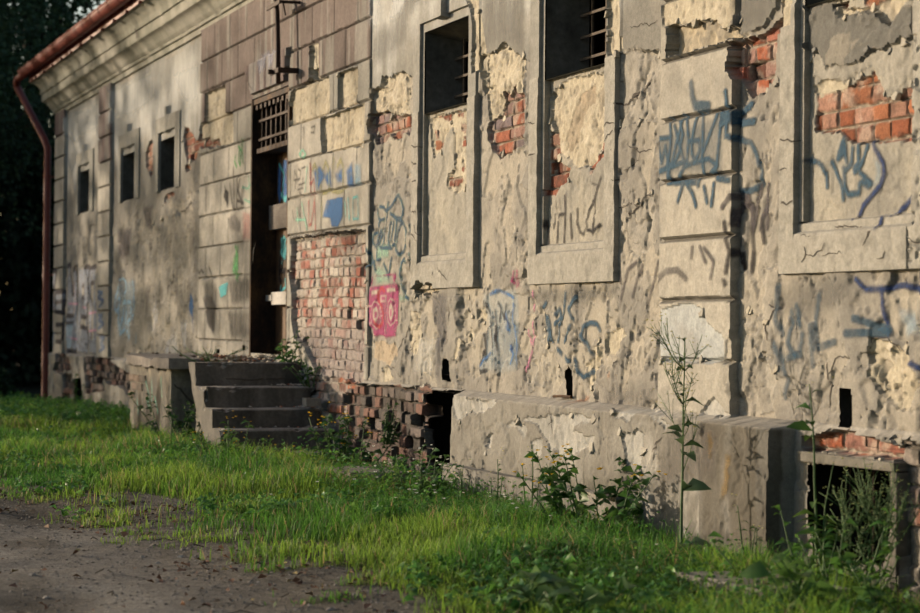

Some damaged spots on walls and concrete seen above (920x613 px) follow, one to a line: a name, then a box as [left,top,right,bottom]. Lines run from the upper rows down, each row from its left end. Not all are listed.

spalling [365,71,412,143]
spalling [470,0,527,159]
spalling [545,71,605,195]
crack [604,80,652,181]
flaking render [604,0,914,143]
crack [619,192,651,219]
crack [800,224,885,262]
flaking render [291,229,444,482]
spalling [454,393,498,425]
spalling [508,412,597,458]
spalling [659,300,782,419]
flaking render [814,428,920,599]